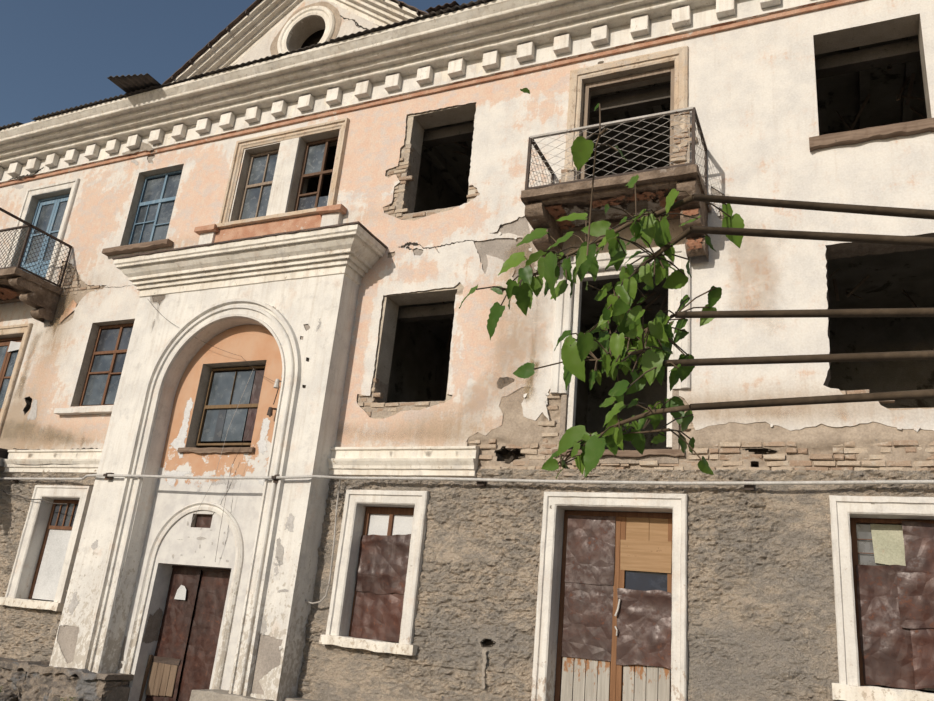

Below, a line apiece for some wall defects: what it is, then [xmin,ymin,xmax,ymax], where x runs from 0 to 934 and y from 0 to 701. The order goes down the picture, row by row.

flaking render [383,146,480,221]
peeling [545,189,699,230]
crack [400,240,474,253]
flaking render [474,217,539,281]
peeling [686,237,704,251]
flaking render [51,261,105,327]
peeling [170,398,193,458]
peeling [257,418,270,455]
flaking render [357,378,452,419]
flaking render [467,377,934,478]
flaking render [56,592,79,663]
flaking render [250,633,284,695]